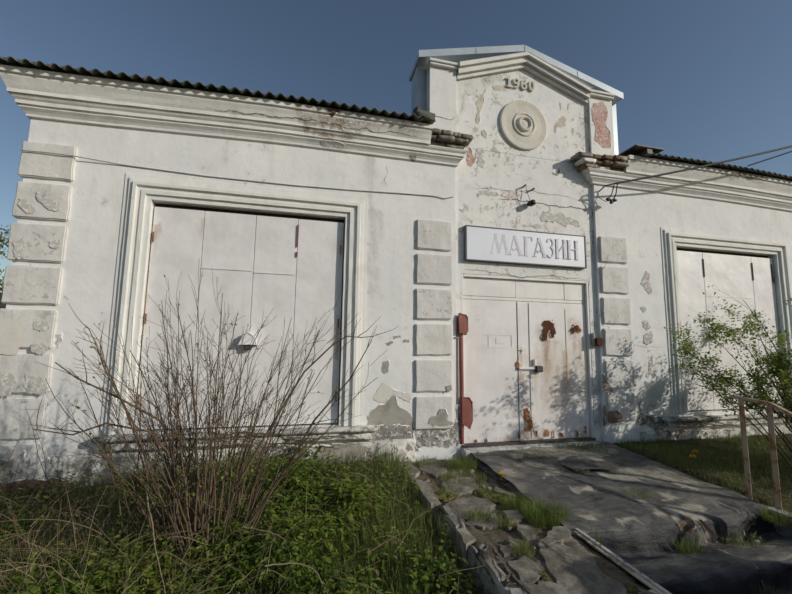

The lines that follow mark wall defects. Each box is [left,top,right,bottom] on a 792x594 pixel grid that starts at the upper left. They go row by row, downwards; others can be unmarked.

crack [219,110,411,136]
peeling [475,85,513,138]
peeling [591,101,611,148]
peeling [466,147,486,168]
crack [476,183,593,217]
peeling [522,211,580,228]
peeling [641,271,652,294]
corrosion [540,320,556,342]
peeling [251,360,460,465]
corrosion [518,408,563,438]
spalling [602,404,622,426]